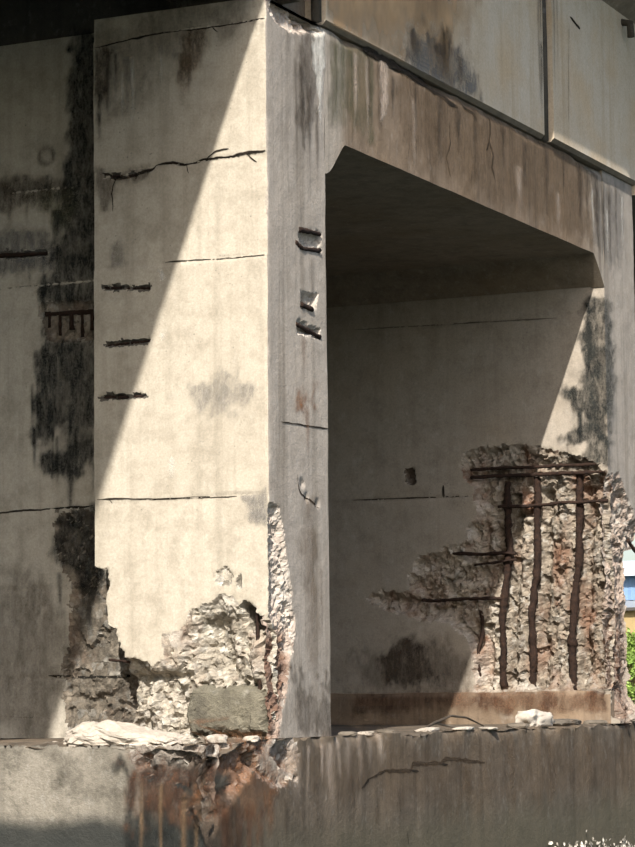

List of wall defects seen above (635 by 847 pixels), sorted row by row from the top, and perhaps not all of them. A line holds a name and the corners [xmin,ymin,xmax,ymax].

crack [95,18,264,48]
water stain [301,31,325,108]
water stain [328,0,476,94]
water stain [0,31,116,309]
crack [103,148,265,211]
water stain [31,332,94,500]
water stain [562,297,615,466]
water stain [53,504,105,634]
spalling [366,443,635,723]
spalling [52,502,301,833]
corrosion [182,743,242,847]
crack [362,757,485,788]